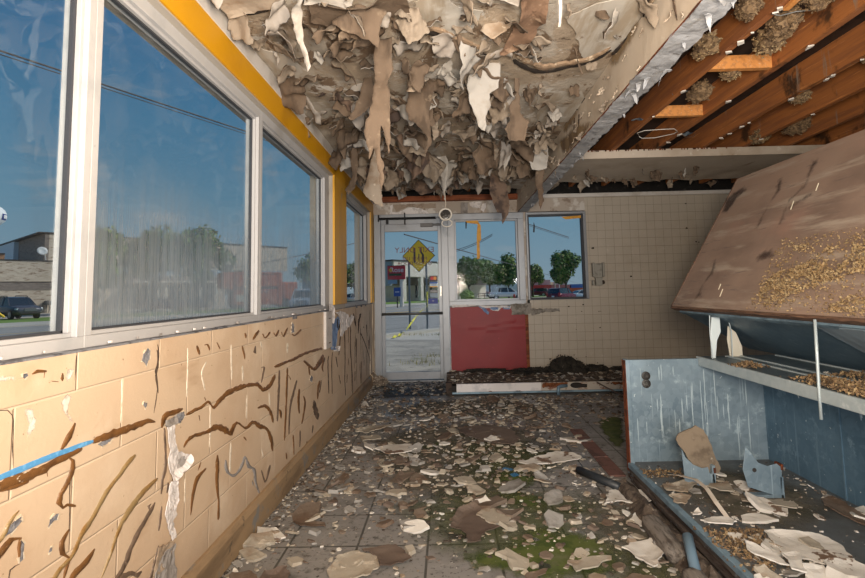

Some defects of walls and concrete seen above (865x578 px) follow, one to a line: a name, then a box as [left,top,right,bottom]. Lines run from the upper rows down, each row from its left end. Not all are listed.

crack [152,344,160,411]
crack [0,410,14,464]
peeling [149,410,194,578]